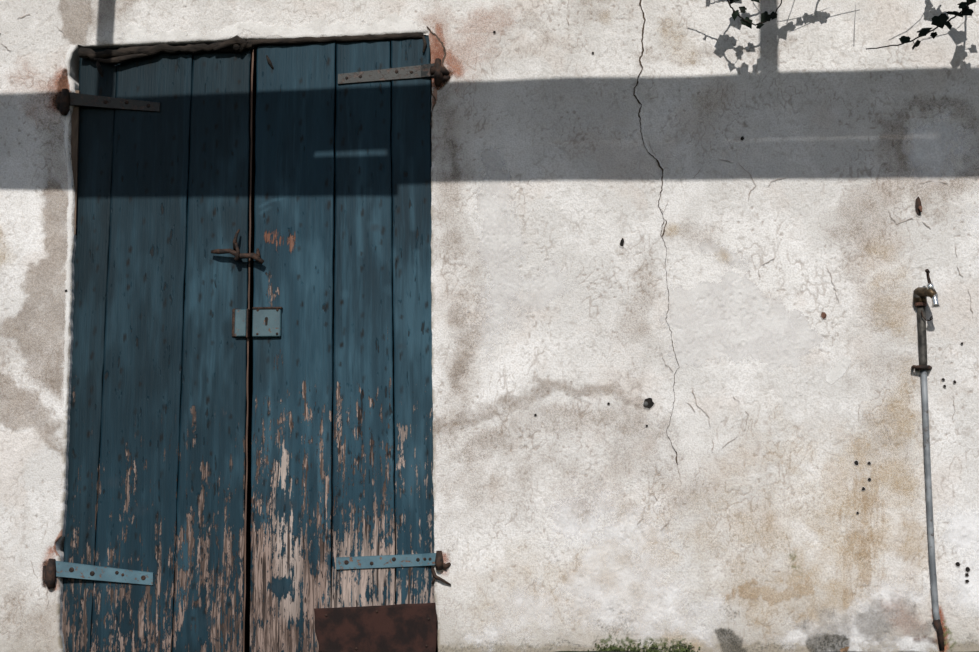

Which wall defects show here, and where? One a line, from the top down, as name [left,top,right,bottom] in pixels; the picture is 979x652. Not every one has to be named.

crack [630,0,749,533]